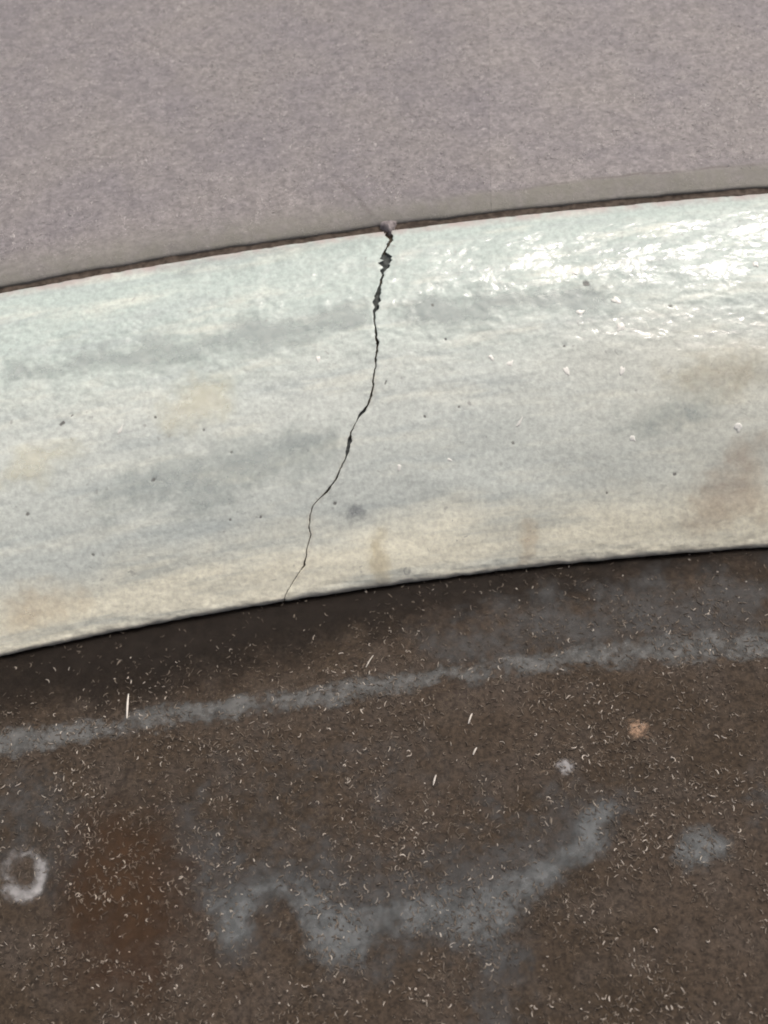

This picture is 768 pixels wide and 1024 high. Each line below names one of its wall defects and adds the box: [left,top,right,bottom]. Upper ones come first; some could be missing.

crack [284,232,393,599]
damp [0,547,768,759]